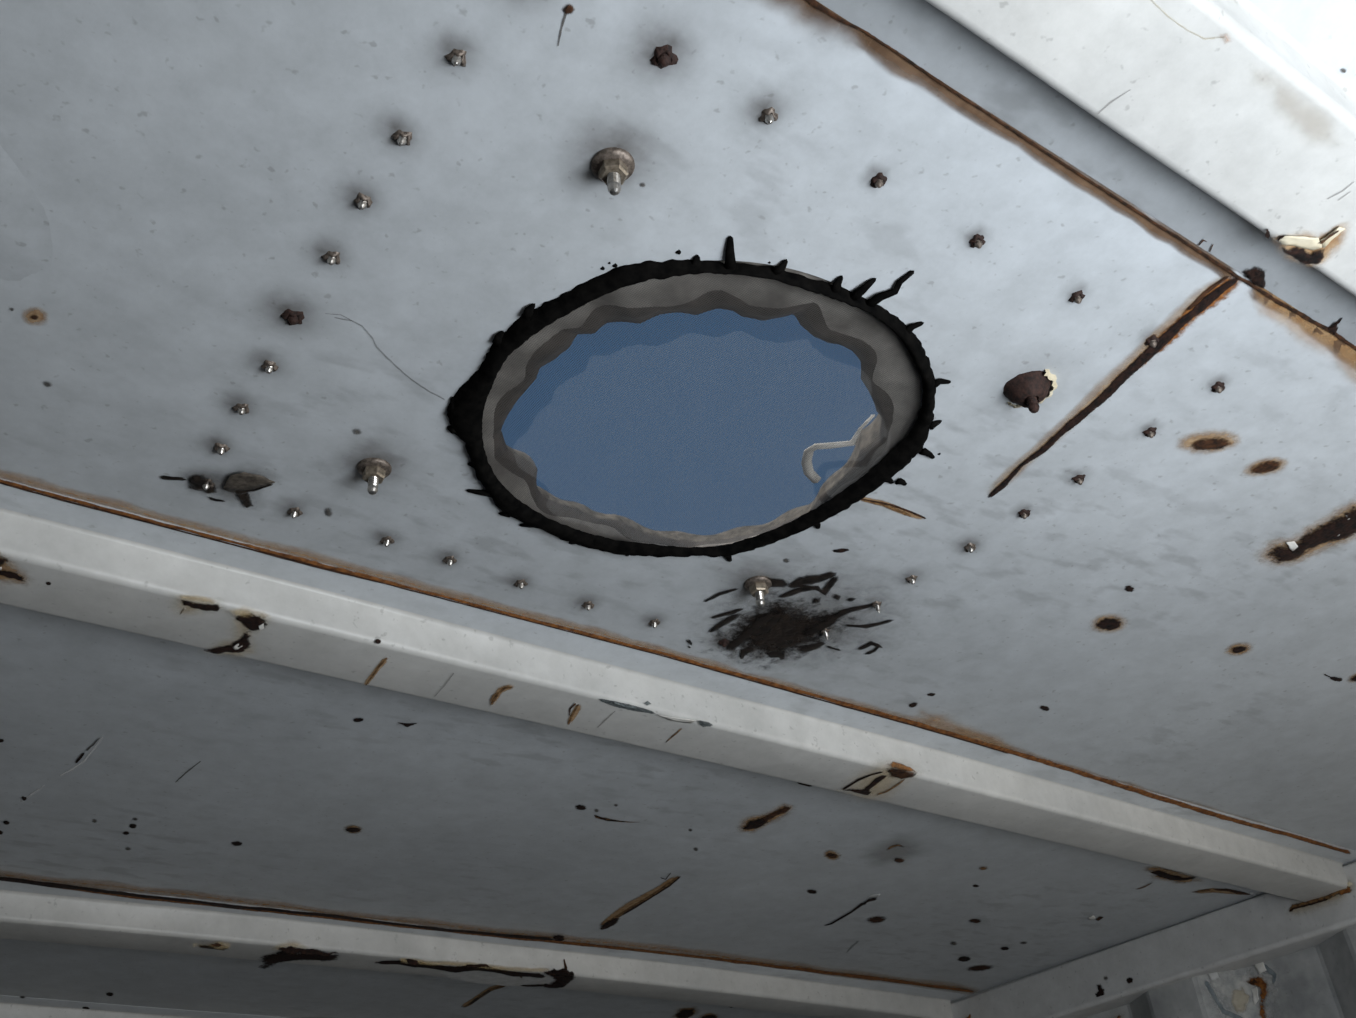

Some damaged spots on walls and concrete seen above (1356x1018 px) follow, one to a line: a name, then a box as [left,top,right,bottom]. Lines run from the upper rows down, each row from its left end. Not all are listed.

peeling [1265,227,1345,264]
rust [1003,370,1052,408]
rust [1183,433,1234,451]
rust [1250,459,1284,474]
rust [0,479,1356,854]
rust [0,873,972,1007]